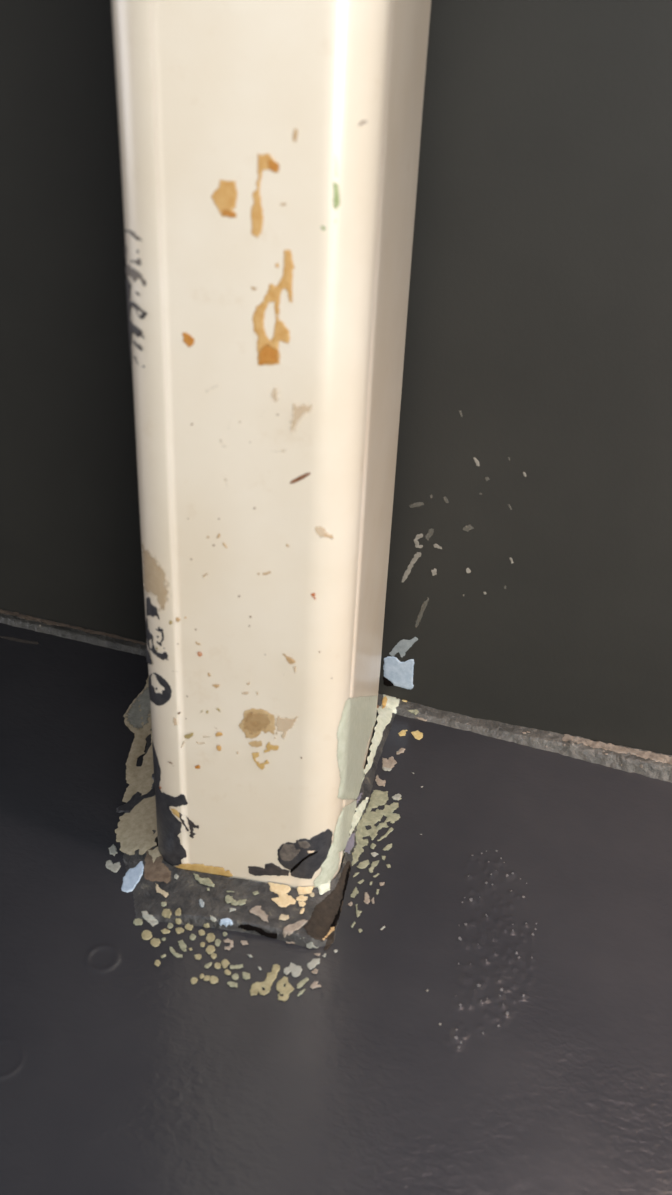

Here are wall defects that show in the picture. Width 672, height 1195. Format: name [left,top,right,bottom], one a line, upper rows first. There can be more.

peeling [105,677,180,893]
peeling [348,656,427,933]
peeling [133,873,338,1001]